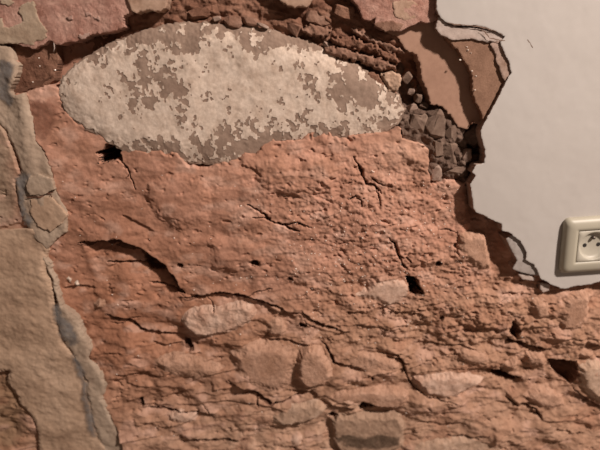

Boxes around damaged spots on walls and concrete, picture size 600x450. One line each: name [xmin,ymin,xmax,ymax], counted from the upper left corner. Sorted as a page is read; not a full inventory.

flaking render [59,0,600,292]
crack [353,156,382,206]
flaking render [0,0,134,450]
crack [78,239,283,309]
crack [301,311,338,330]